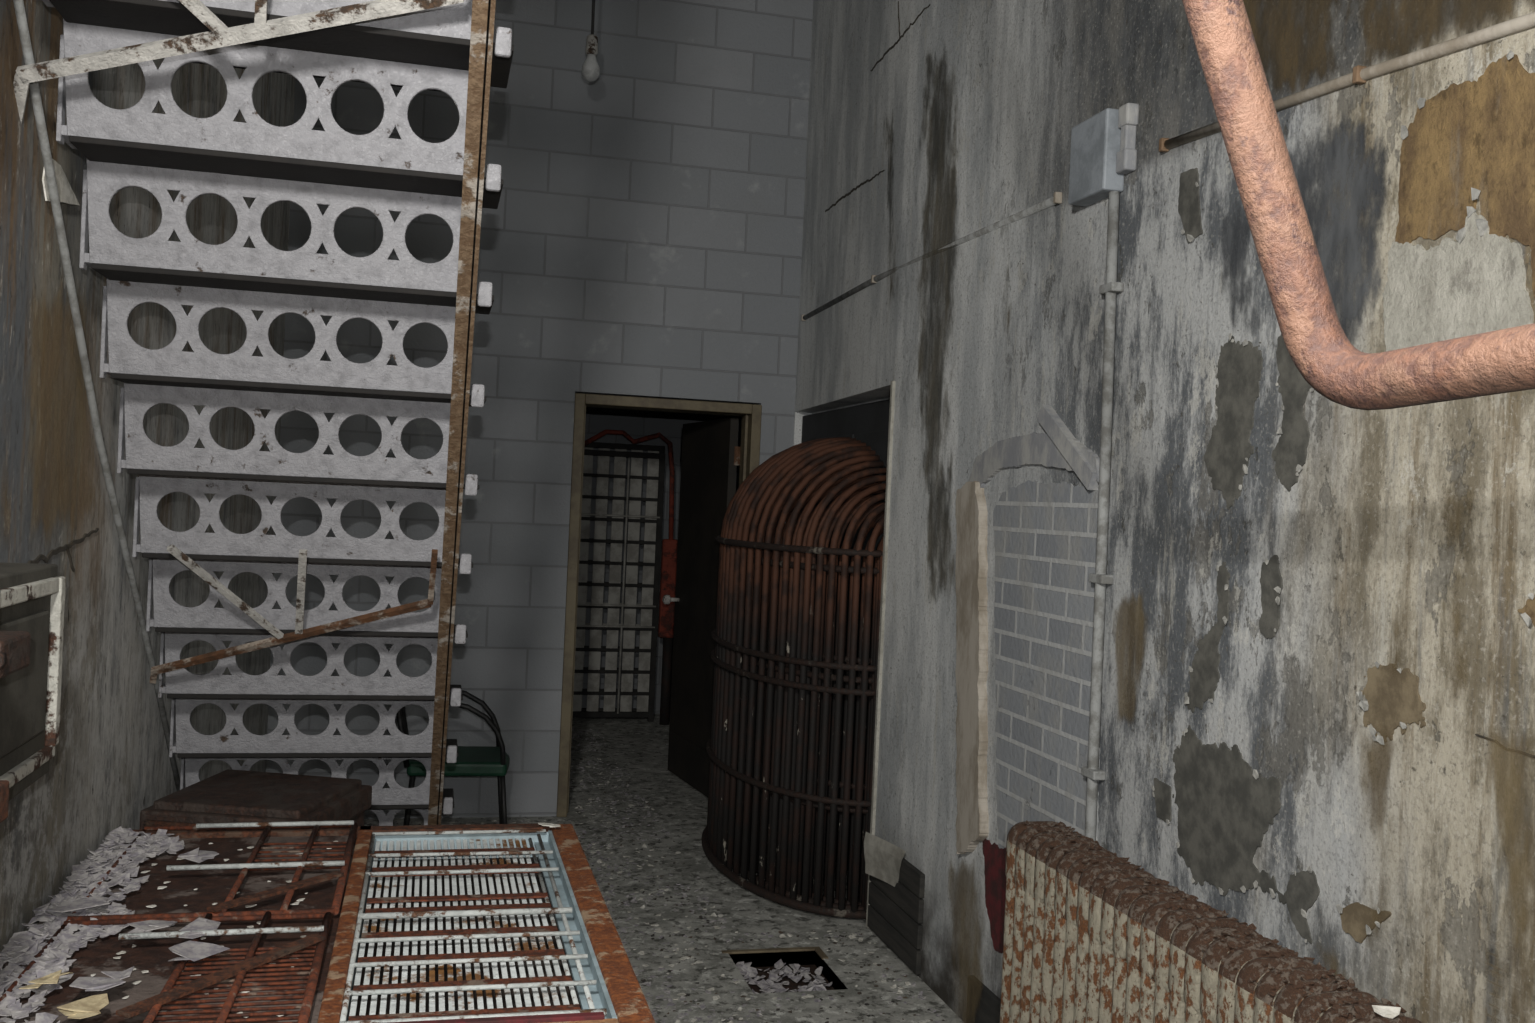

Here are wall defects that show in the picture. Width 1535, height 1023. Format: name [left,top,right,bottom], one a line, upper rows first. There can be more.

water stain [918,55,956,591]
water stain [1222,215,1257,326]
water stain [1289,121,1385,341]
flaking render [1382,50,1535,351]
spalling [1517,593,1535,627]
peeling [1151,555,1320,943]
spalling [1356,661,1426,745]
crack [1475,734,1535,758]
spalling [1336,902,1392,943]